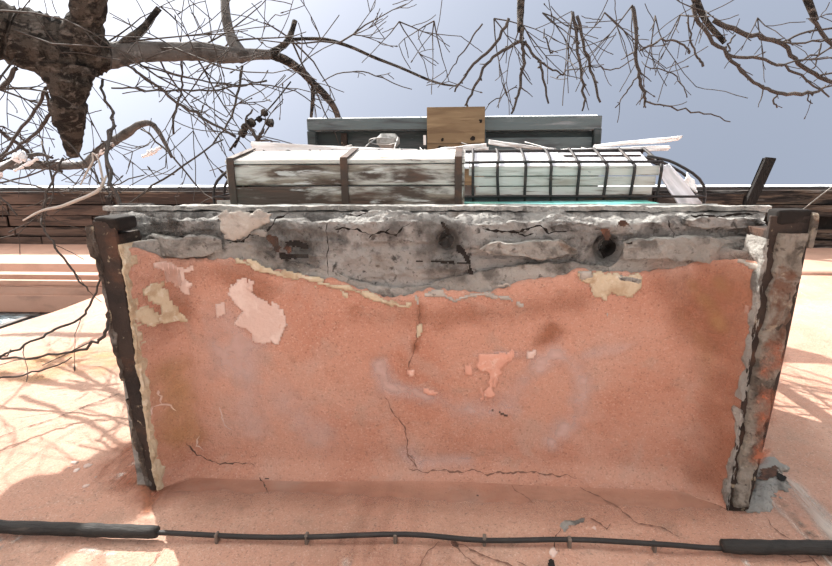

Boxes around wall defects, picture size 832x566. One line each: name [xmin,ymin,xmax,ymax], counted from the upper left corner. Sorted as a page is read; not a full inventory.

peeling [218,209,309,259]
crack [326,212,410,266]
spalling [416,222,473,275]
crack [483,225,567,237]
spalling [598,229,616,258]
crack [690,211,756,219]
peeling [132,261,194,350]
peeling [215,258,524,345]
peeling [578,271,642,301]
rust [112,445,165,512]
crack [386,398,681,566]
water stain [789,480,832,539]